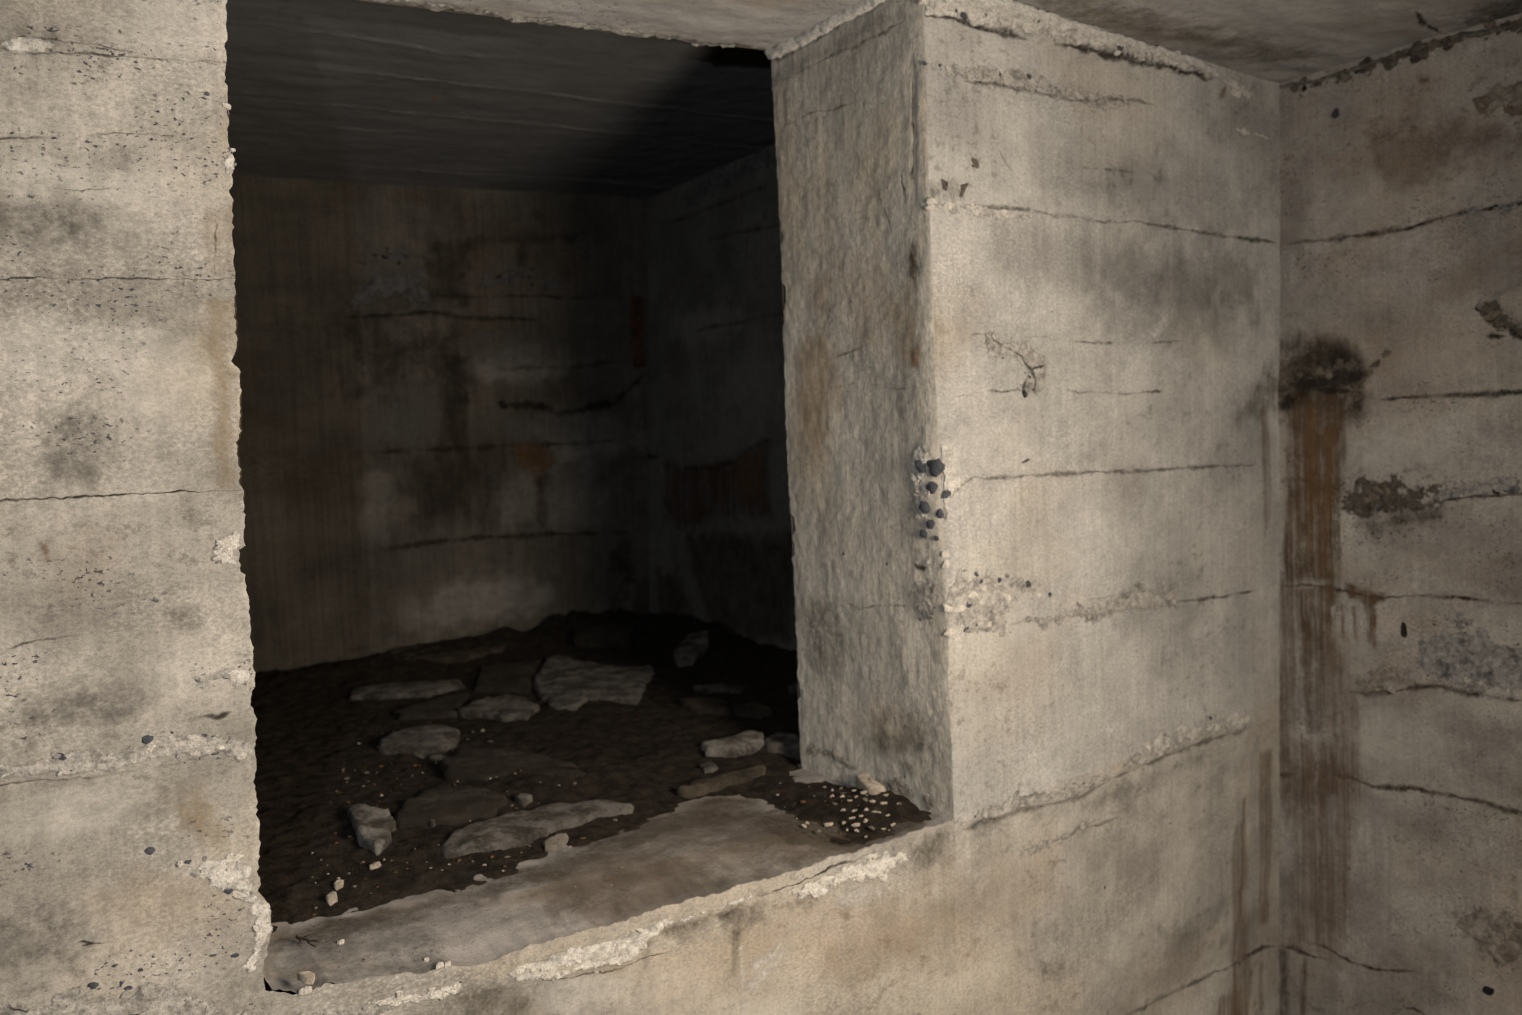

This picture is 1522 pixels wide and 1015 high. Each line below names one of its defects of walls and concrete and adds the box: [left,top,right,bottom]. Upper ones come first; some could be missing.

crack [1137,202,1522,243]
crack [0,489,210,502]
spalling [1342,473,1520,518]
spalling [911,444,1178,638]
rust [1265,336,1384,941]
crack [1339,774,1522,814]
spalling [789,847,908,900]
spalling [509,894,752,982]
peeling [368,957,462,1006]